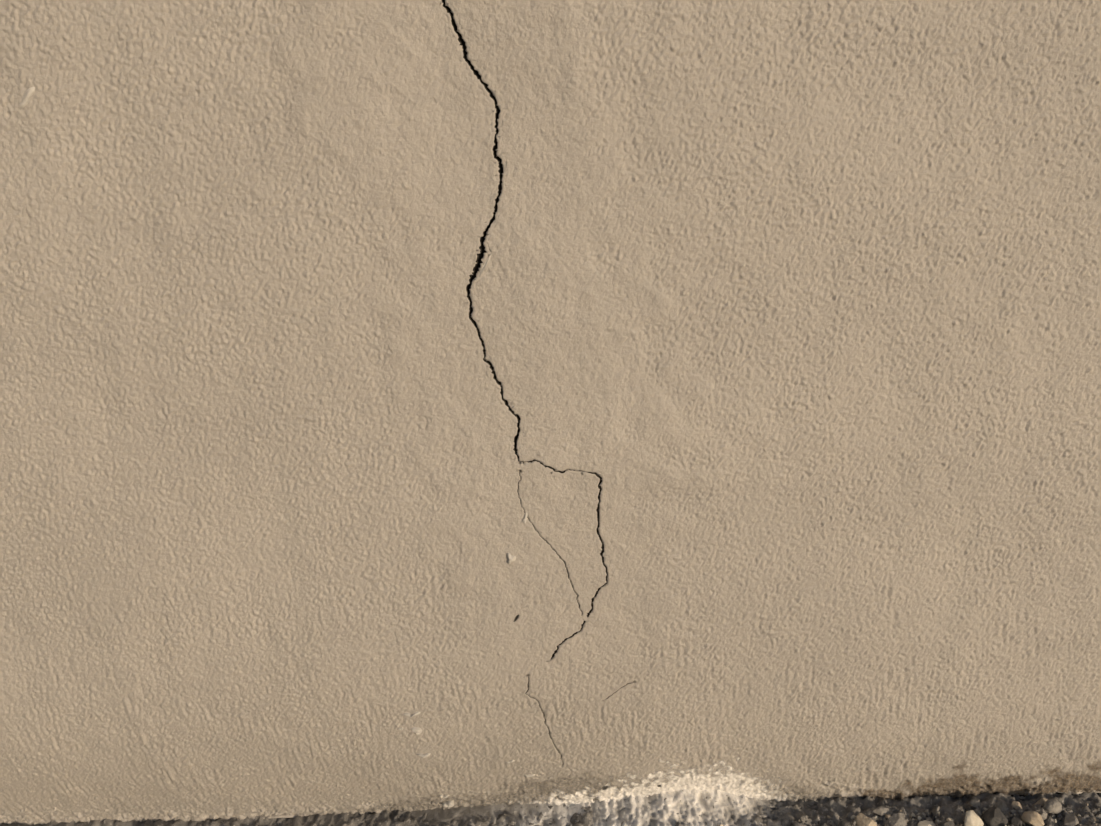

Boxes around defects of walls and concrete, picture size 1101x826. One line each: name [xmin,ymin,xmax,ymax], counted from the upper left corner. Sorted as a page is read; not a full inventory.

crack [437,0,611,767]